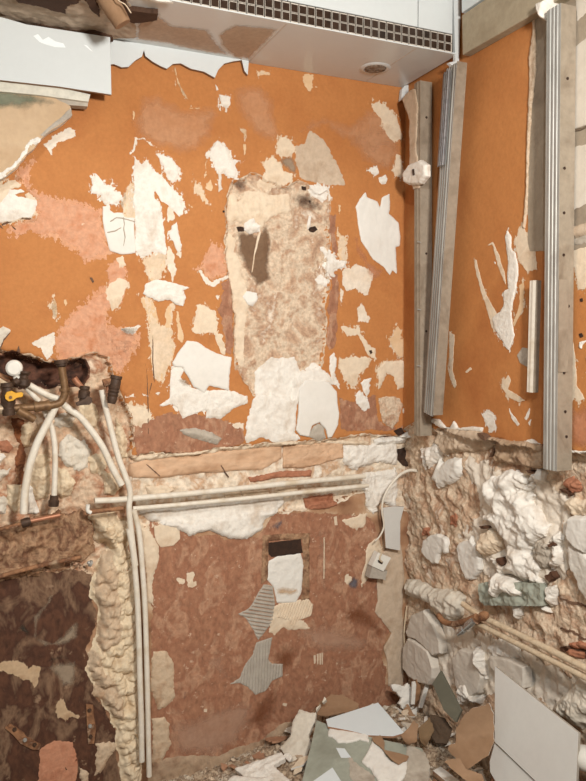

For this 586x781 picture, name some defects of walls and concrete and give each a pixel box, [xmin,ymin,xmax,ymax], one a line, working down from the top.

spalling [0,0,274,113]
flaking render [564,0,586,46]
flaking render [508,17,547,320]
spalling [0,92,586,680]
spalling [408,677,495,770]
spalling [526,682,586,745]